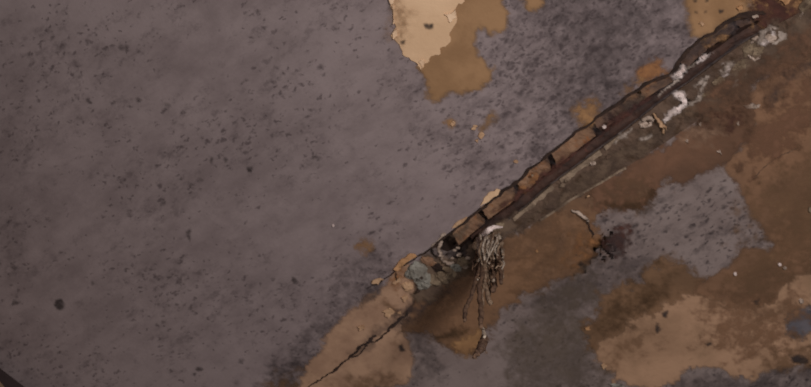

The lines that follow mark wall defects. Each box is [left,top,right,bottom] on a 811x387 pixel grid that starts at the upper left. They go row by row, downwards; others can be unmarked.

peeling [389,0,509,103]
rust [637,60,669,83]
peeling [685,0,811,38]
rust [573,99,600,126]
leakage [386,22,811,387]
rust [571,210,633,258]
crack [308,311,408,387]
peeling [594,274,811,387]